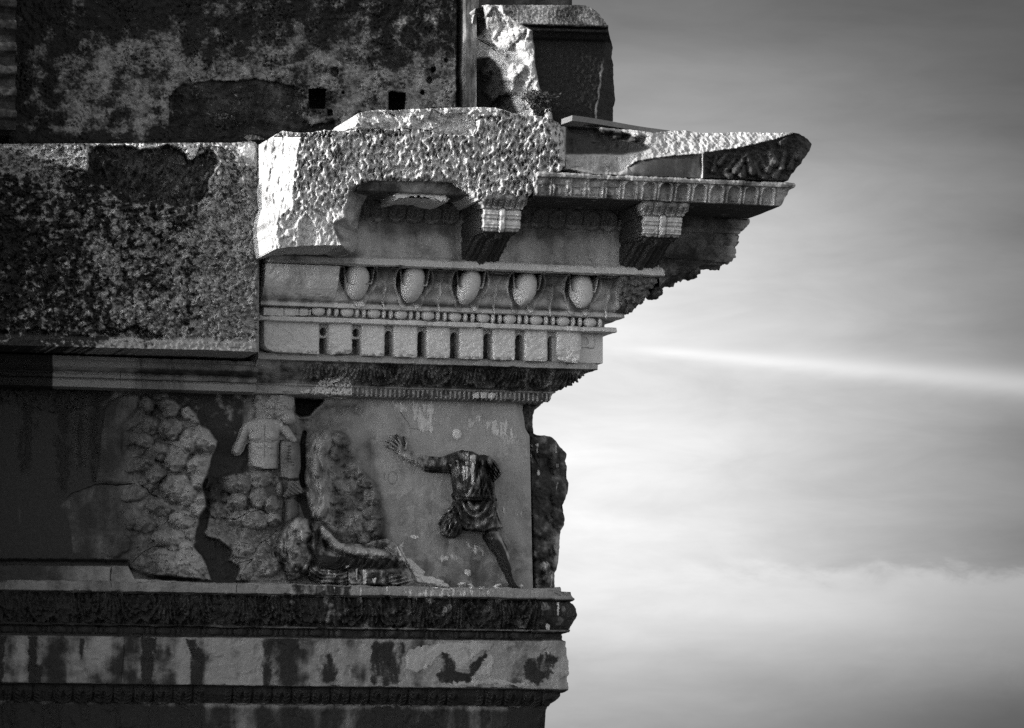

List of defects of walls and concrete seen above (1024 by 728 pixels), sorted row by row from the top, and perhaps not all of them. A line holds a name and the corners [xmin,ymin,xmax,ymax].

flaking render [0,78,334,207]
water stain [261,641,272,687]
water stain [369,640,405,687]